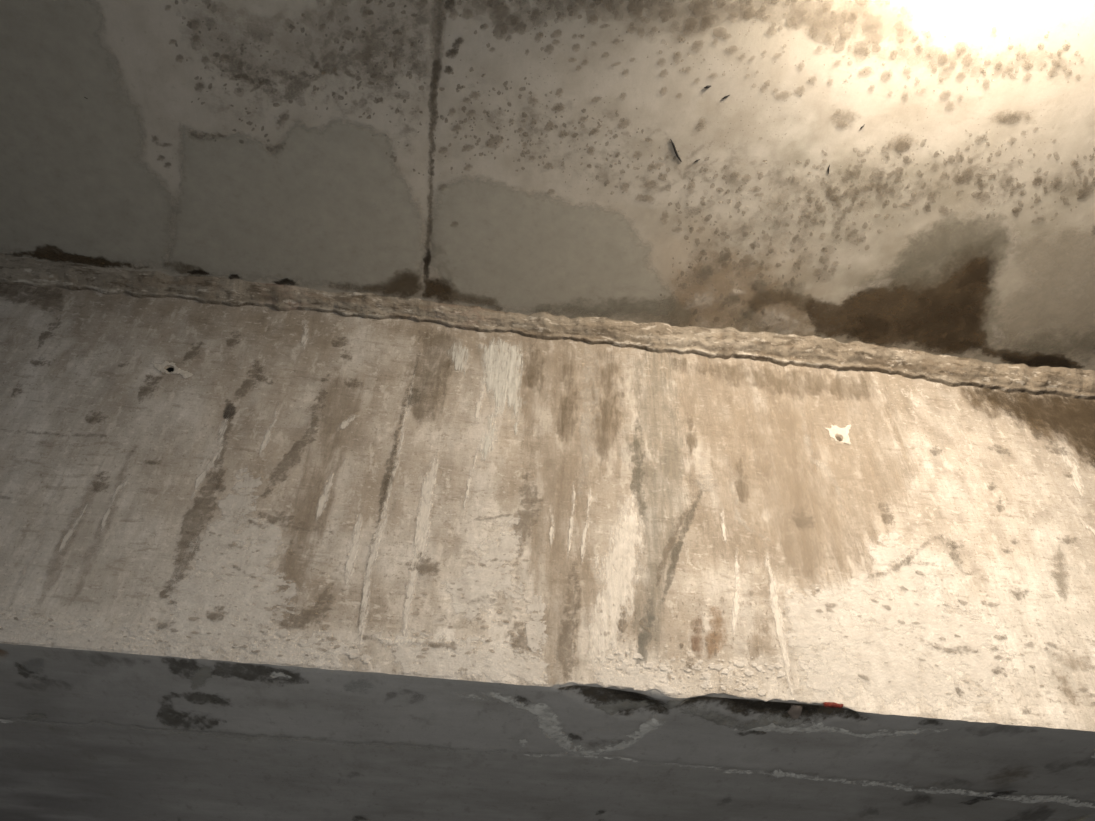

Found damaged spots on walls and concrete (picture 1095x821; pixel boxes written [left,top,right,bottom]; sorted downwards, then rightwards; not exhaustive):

leakage [0,0,694,324]
crack [423,0,462,282]
leakage [731,236,1082,369]
leakage [160,369,273,598]
leakage [403,459,438,634]
leakage [464,339,533,507]
leakage [514,465,591,564]
leakage [658,481,702,588]
peeling [373,494,1015,730]
leakage [766,560,792,691]
leakage [966,389,1095,463]
crack [964,791,1018,805]